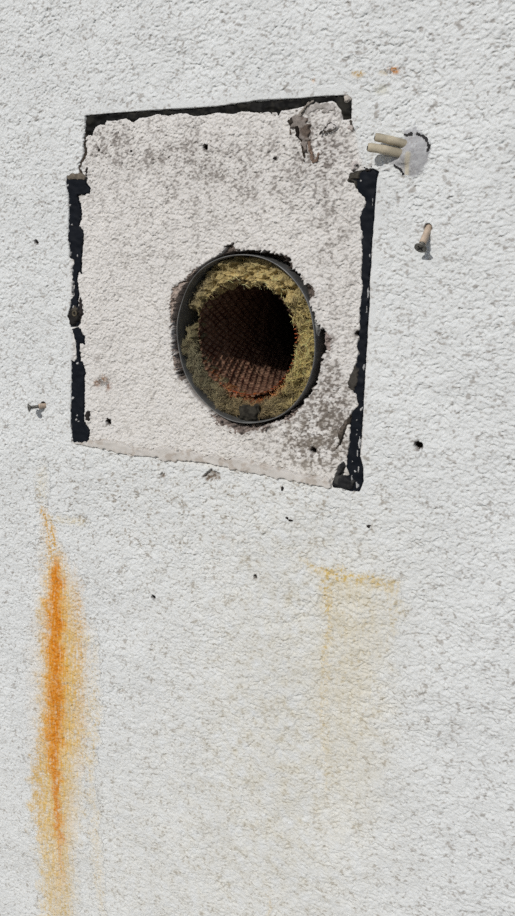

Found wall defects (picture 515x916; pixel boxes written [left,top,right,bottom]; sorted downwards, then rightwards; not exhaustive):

peeling [287,100,354,163]
corrosion [21,455,108,916]